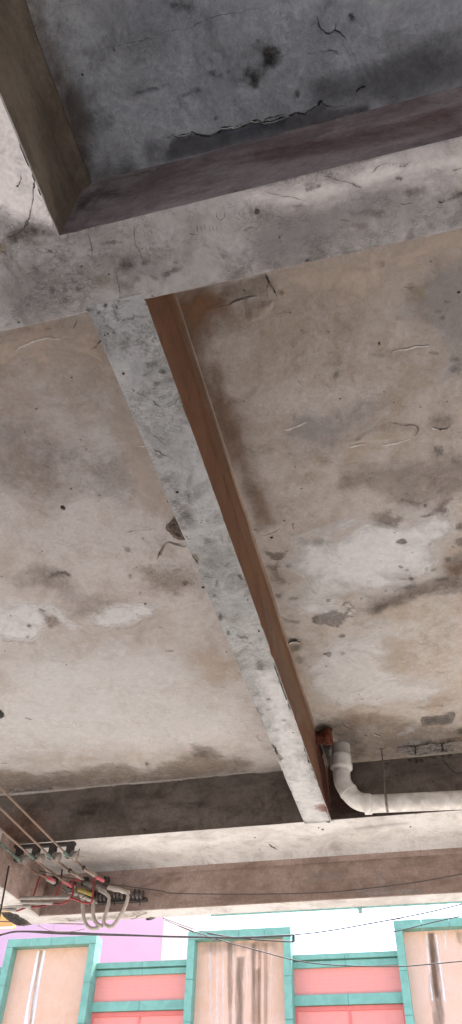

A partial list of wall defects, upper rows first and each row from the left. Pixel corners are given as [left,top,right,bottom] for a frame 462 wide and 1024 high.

crack [307,18,346,55]
damp [245,47,279,86]
crack [167,86,366,139]
crack [5,175,43,239]
spalling [157,515,198,564]
damp [372,557,462,612]
peeling [0,603,78,652]
peeling [92,603,155,629]
spalling [394,705,462,756]
damp [0,753,245,791]